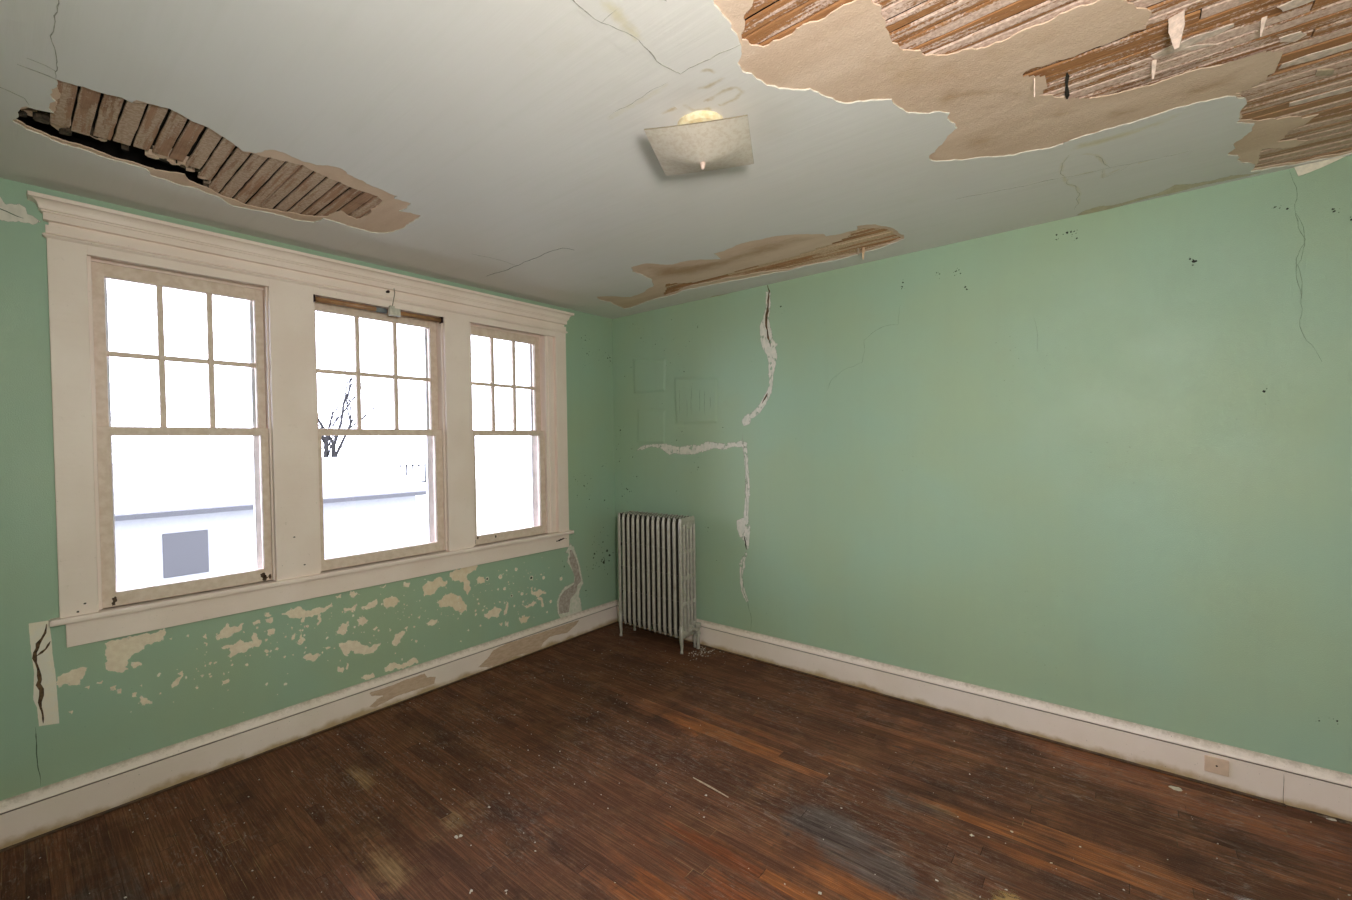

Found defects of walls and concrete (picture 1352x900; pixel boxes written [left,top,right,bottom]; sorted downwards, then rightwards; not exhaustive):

flaking render [19,80,382,219]
flaking render [741,0,854,46]
flaking render [872,0,1097,55]
flaking render [1023,0,1352,215]
flaking render [664,228,900,298]
crack [736,285,778,623]
crack [32,624,51,785]
peeling [56,538,583,712]